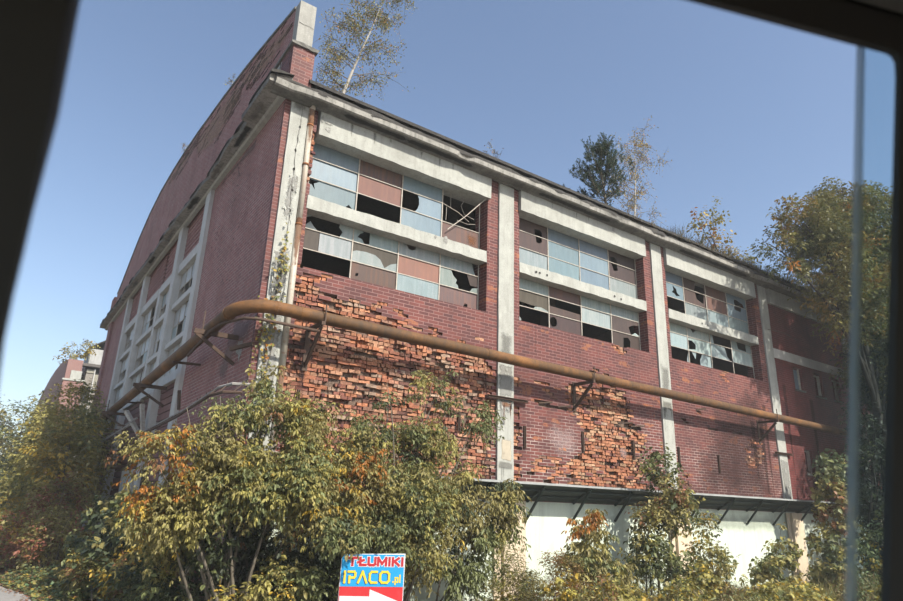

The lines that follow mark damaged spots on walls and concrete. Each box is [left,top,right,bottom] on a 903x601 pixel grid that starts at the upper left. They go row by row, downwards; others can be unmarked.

spalling [169,21,293,183]
spalling [270,251,441,337]
spalling [252,313,650,490]
spalling [745,439,764,473]